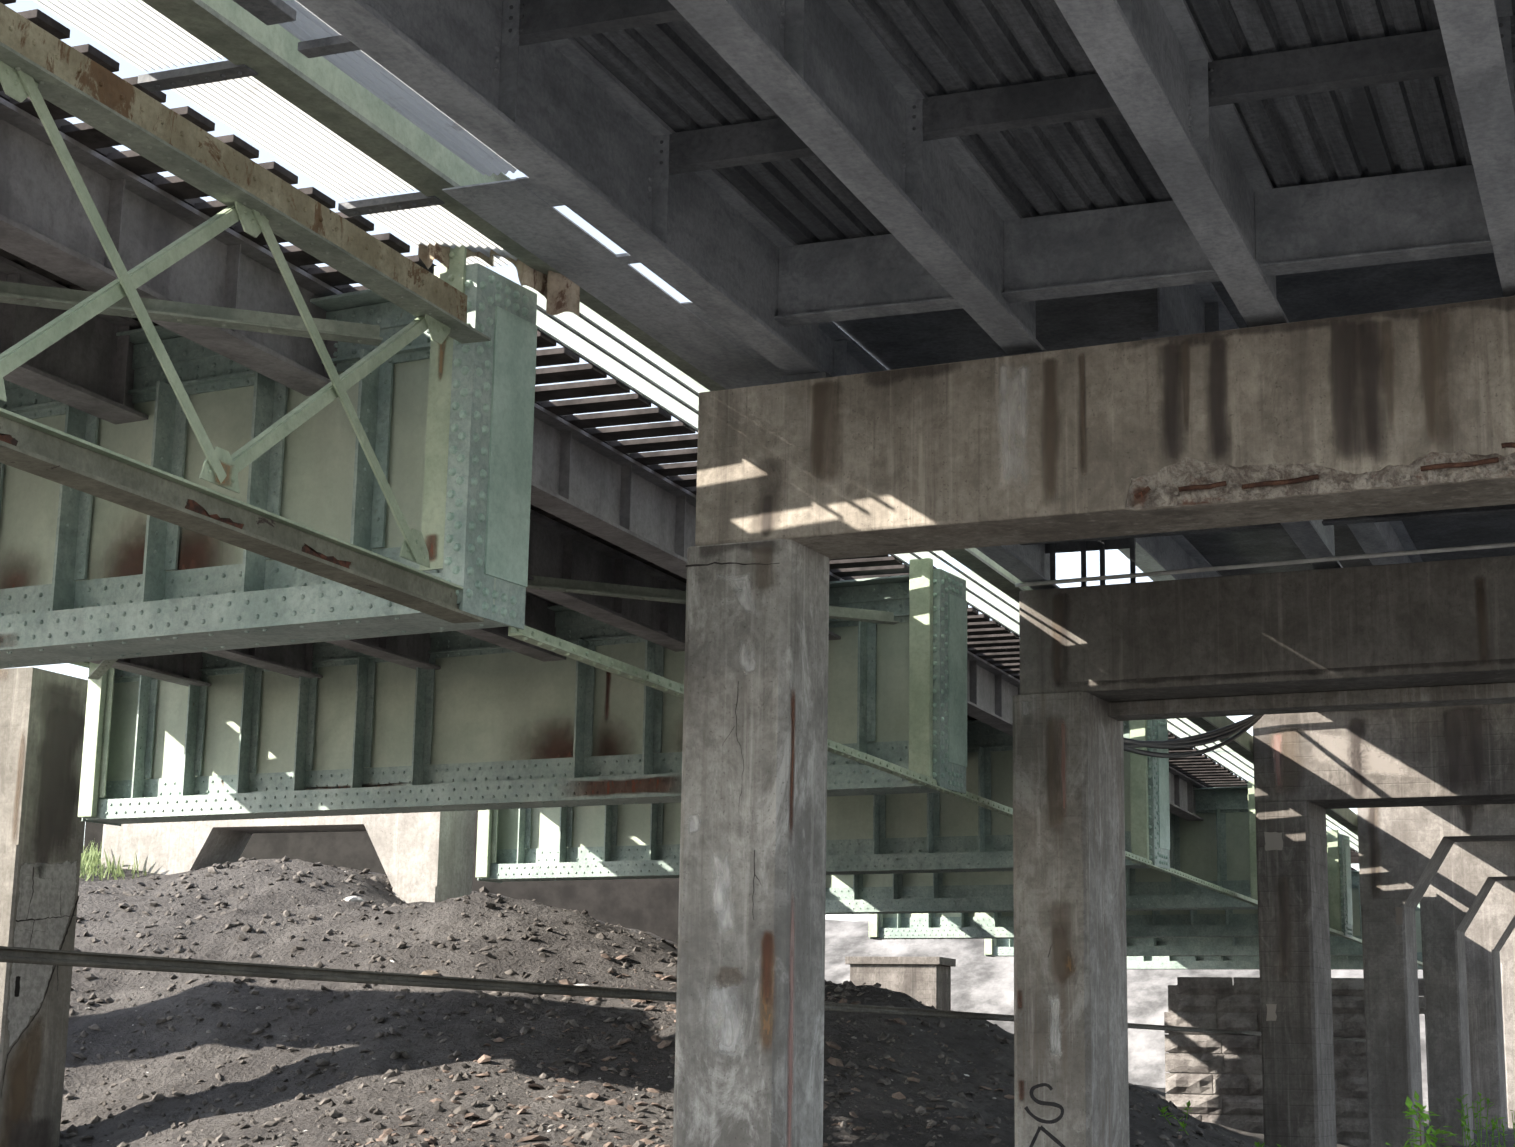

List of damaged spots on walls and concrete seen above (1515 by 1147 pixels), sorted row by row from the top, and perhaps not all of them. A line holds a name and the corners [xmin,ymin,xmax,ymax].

leakage [1145,296,1515,458]
leakage [814,383,836,476]
leakage [1044,361,1057,492]
spalling [1126,442,1515,510]
rust [0,567,30,589]
rust [108,540,145,578]
rust [177,531,220,570]
rust [532,729,574,759]
rust [577,776,675,796]
leakage [1350,720,1365,793]
leakage [1445,709,1482,830]
rust [761,907,794,1147]